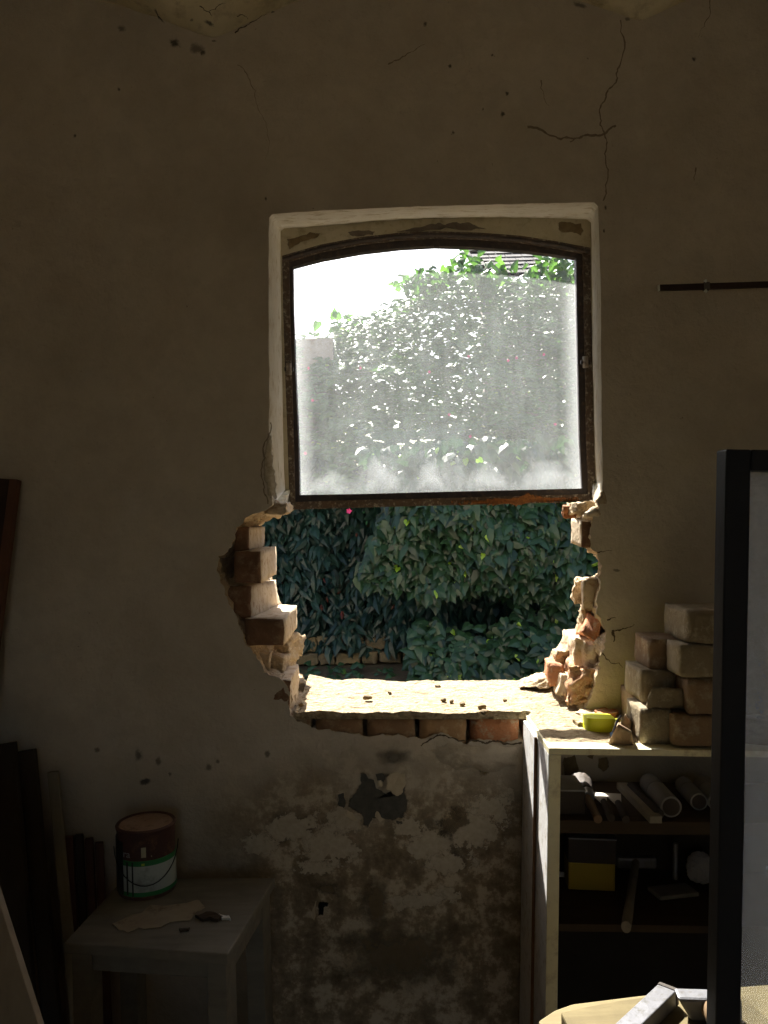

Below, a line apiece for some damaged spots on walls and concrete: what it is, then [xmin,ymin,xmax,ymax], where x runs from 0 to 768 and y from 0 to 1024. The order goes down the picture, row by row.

crack [527,20,626,201]
peeling [559,222,583,235]
spalling [228,423,634,745]
leakage [236,802,373,894]
peeling [338,772,408,826]
leakage [338,787,516,989]